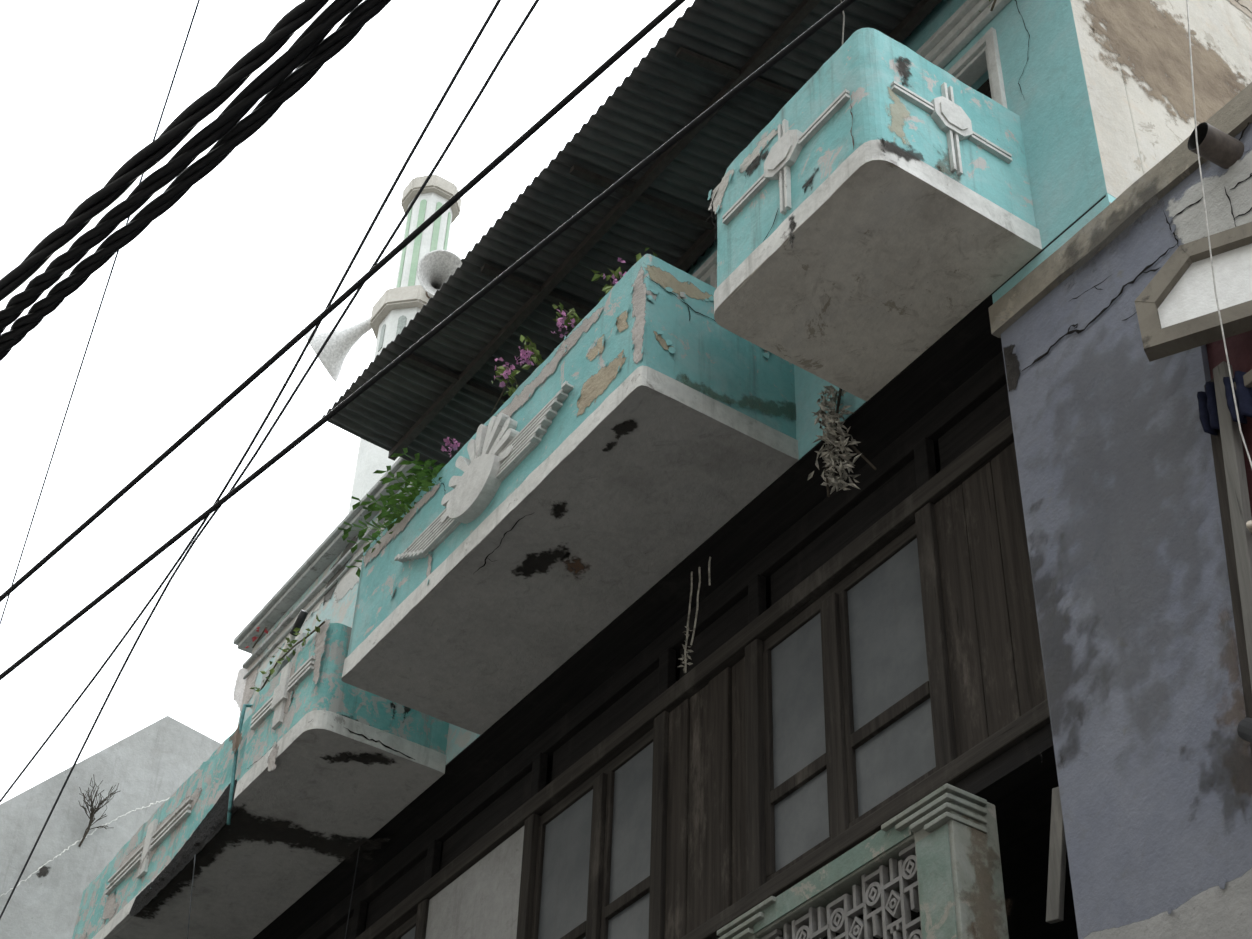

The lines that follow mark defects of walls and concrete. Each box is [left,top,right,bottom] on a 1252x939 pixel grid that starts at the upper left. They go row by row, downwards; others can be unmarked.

crack [1015,0,1030,100]
spalling [1228,0,1252,18]
peeling [707,123,779,214]
crack [1021,173,1252,372]
peeling [487,263,714,427]
damp [551,502,568,518]
damp [512,543,589,579]
peeling [266,742,279,772]
damp [320,752,395,765]
spalling [101,779,238,923]
damp [135,804,388,919]
spalling [1083,868,1252,939]